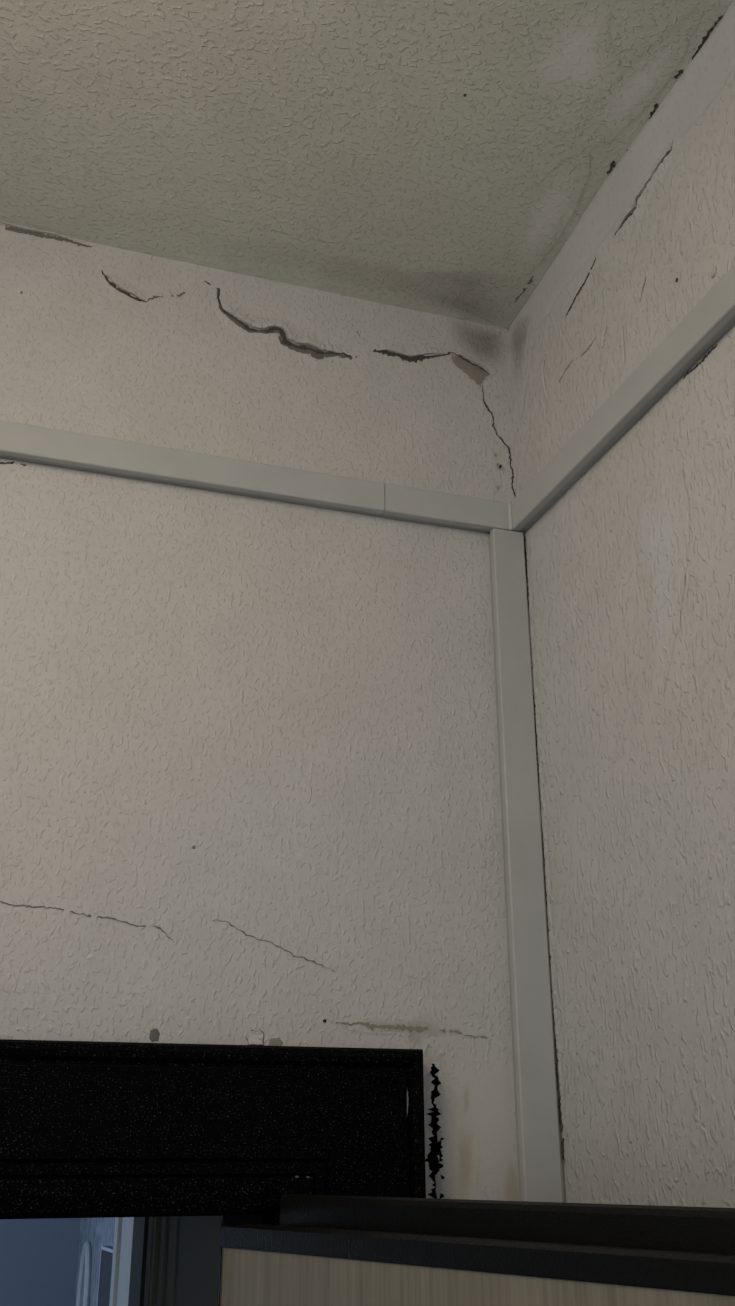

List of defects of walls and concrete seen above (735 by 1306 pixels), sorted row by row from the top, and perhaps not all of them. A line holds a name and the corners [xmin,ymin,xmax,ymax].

crack [566,15,723,316]
crack [93,265,451,369]
crack [0,901,172,940]